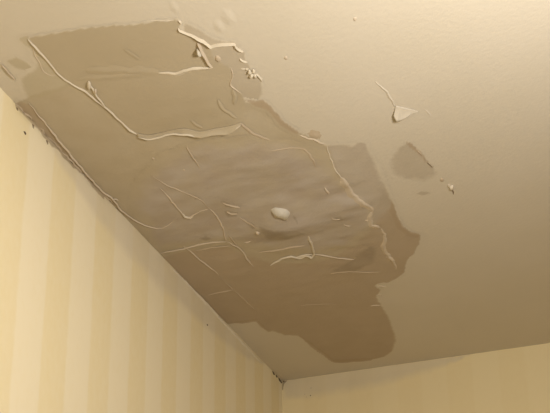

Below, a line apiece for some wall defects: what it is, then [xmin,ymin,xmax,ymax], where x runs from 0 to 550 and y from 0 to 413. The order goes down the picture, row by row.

peeling [27,17,266,140]
peeling [13,102,112,203]
water stain [3,34,471,406]
peeling [300,130,397,269]